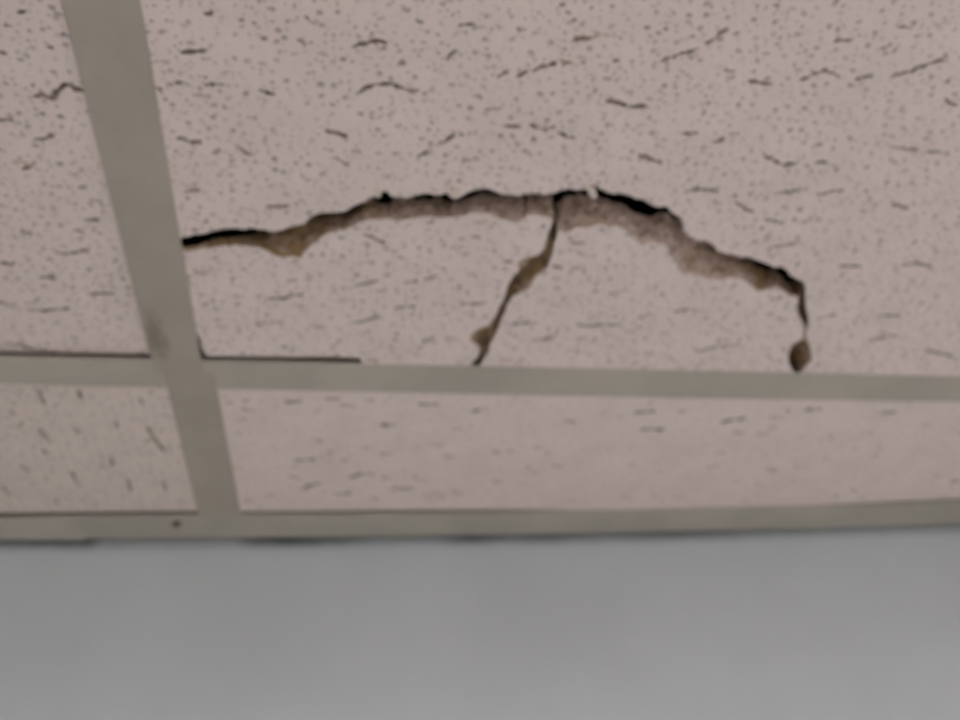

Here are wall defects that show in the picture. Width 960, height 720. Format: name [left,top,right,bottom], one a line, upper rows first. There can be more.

crack [182,186,808,342]
crack [477,280,520,365]